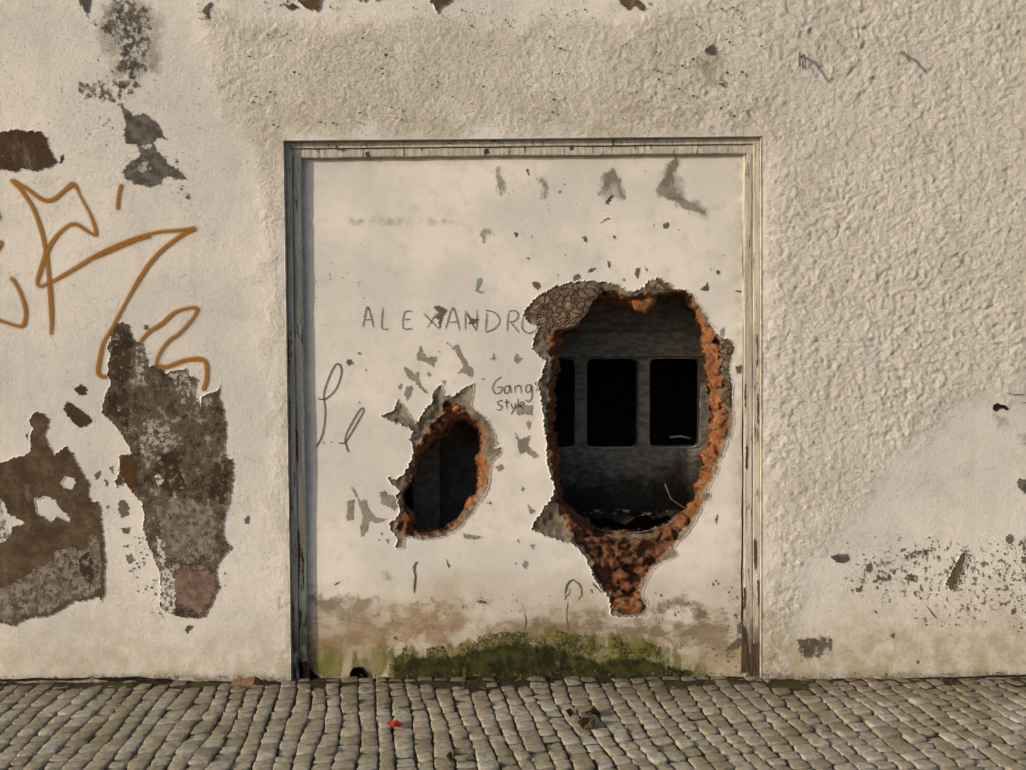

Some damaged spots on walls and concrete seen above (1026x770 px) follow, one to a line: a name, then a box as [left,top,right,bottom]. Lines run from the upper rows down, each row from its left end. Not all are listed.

peeling [259,0,379,17]
peeling [413,0,494,27]
peeling [618,0,651,16]
peeling [0,128,64,173]
peeling [434,306,447,328]
peeling [0,321,250,634]
spalling [346,342,504,550]
spalling [514,261,742,669]
peeling [845,534,1026,636]